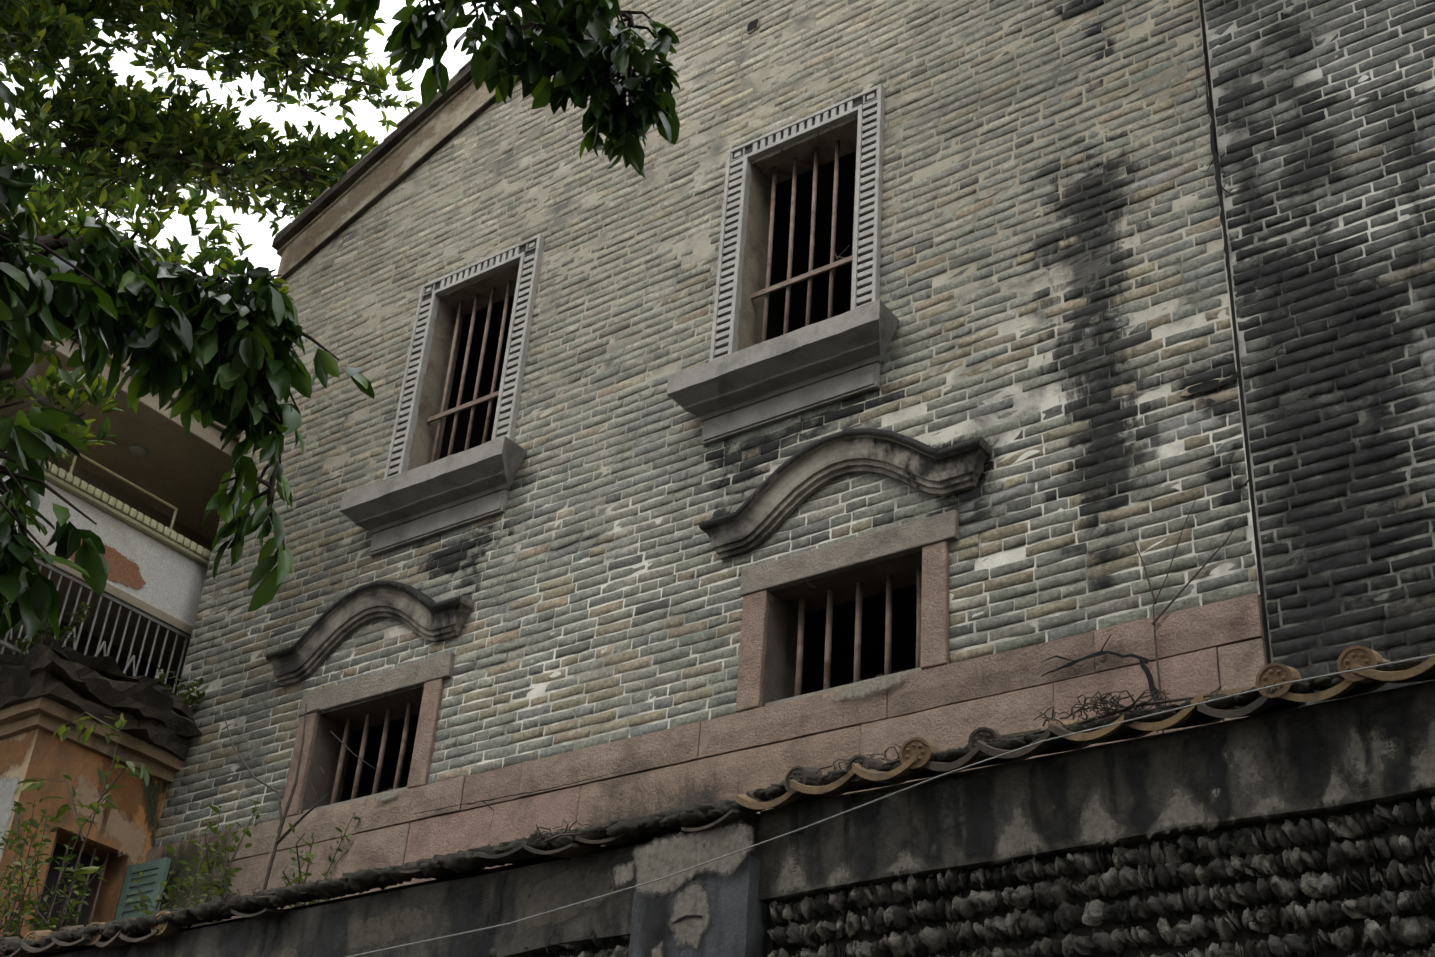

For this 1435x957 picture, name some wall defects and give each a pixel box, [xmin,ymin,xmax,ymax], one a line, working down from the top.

water stain [1180,13,1435,671]
flaking render [103,543,146,590]
water stain [908,776,994,865]
water stain [1104,749,1153,833]
water stain [1183,730,1234,820]
water stain [1352,680,1434,796]
flaking render [518,823,752,957]